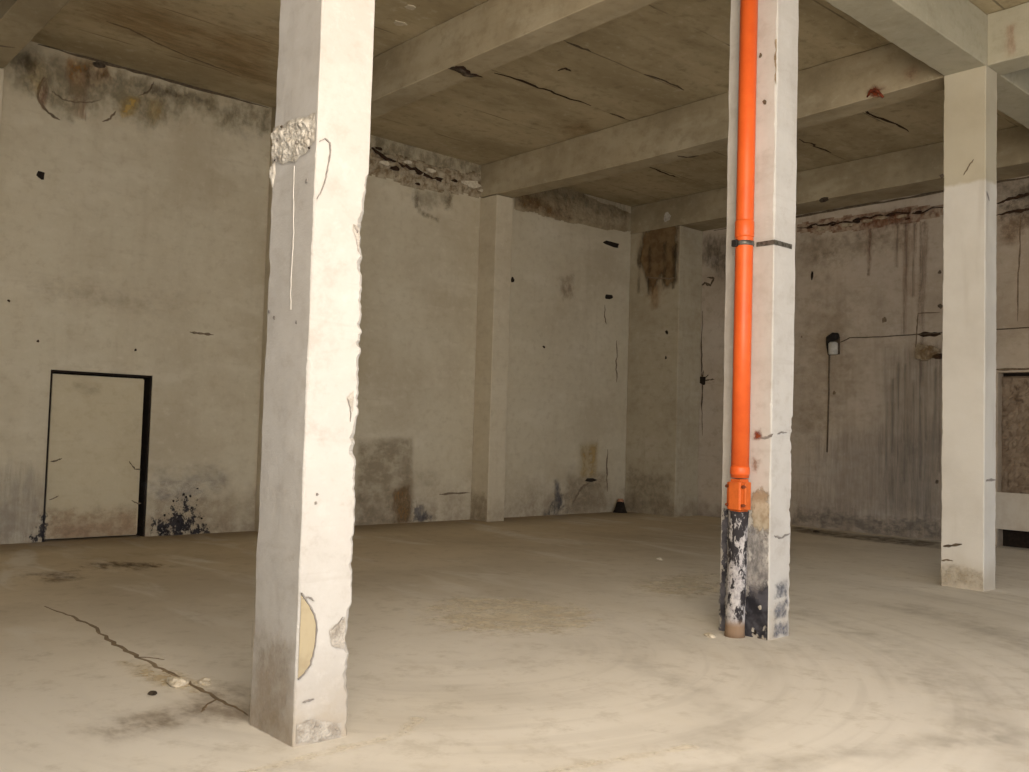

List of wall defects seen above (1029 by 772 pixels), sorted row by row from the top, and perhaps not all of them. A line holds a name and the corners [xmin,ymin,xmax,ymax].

crack [495,42,625,119]
spalling [271,113,316,164]
spalling [368,147,483,198]
peeling [514,187,631,248]
crack [796,190,944,218]
crack [987,176,1029,321]
water stain [151,488,210,536]
crack [44,606,248,715]